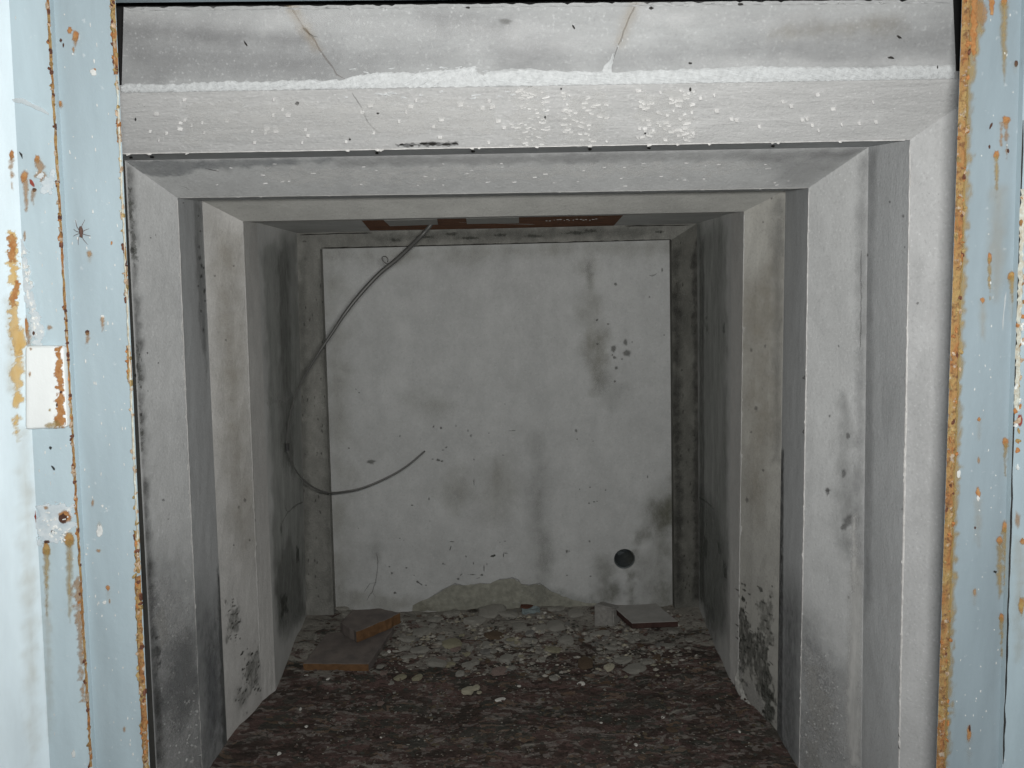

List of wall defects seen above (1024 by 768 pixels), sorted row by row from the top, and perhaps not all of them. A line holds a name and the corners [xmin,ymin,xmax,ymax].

rust [109,0,119,75]
crack [602,39,623,73]
rust [111,241,129,303]
rust [5,0,100,768]
rust [936,0,1018,768]
peeling [34,501,77,547]
rust [132,530,150,768]
water stain [148,562,260,768]
water stain [736,454,861,767]